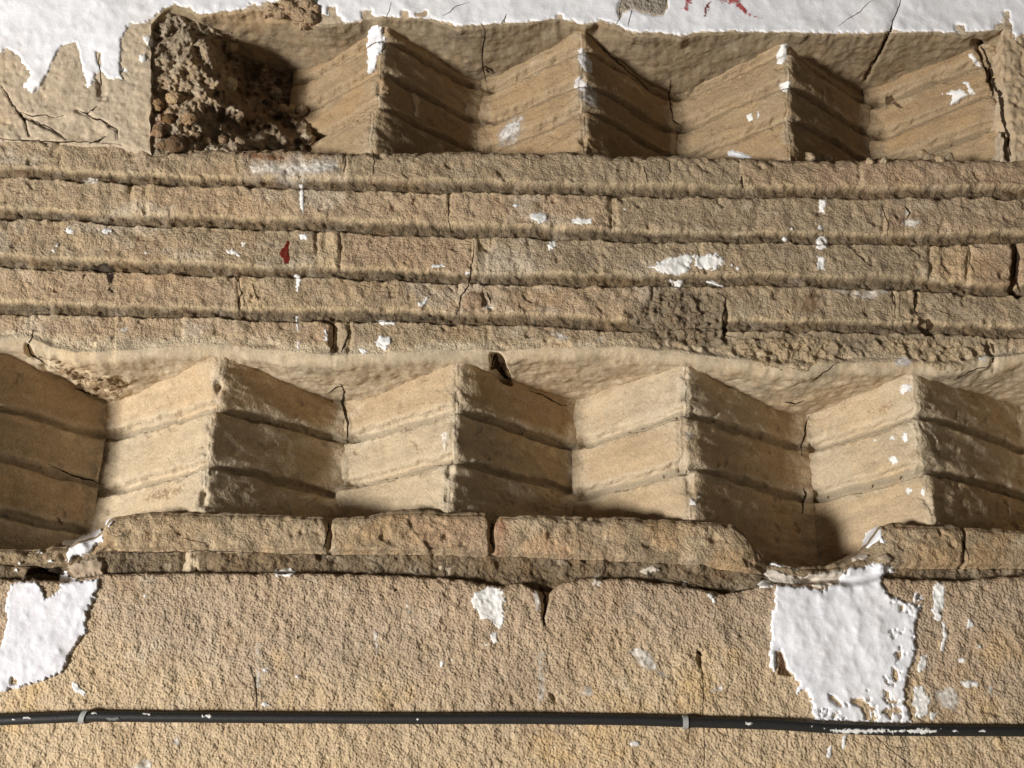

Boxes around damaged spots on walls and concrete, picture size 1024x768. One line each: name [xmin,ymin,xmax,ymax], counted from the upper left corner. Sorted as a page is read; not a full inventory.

crack [0,54,122,146]
spalling [0,0,316,156]
flaking render [314,0,1024,41]
crack [865,0,901,80]
crack [976,42,1011,156]
crack [447,198,491,319]
crack [328,384,349,439]
flaking render [0,519,114,696]
crack [539,586,547,626]
flaking render [757,526,923,725]